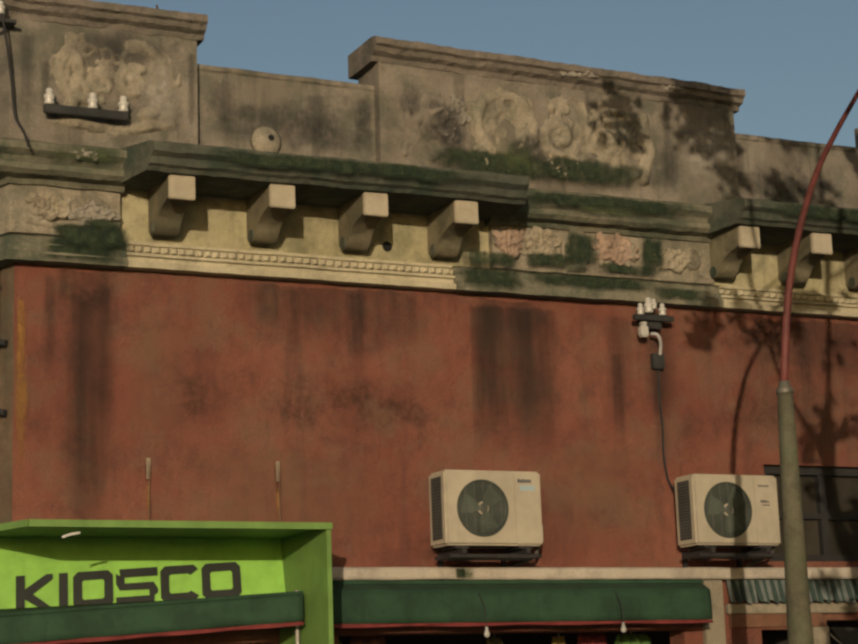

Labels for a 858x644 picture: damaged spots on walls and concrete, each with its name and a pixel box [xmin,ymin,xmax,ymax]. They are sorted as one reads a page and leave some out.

spalling [492,226,563,259]
spalling [591,231,640,265]